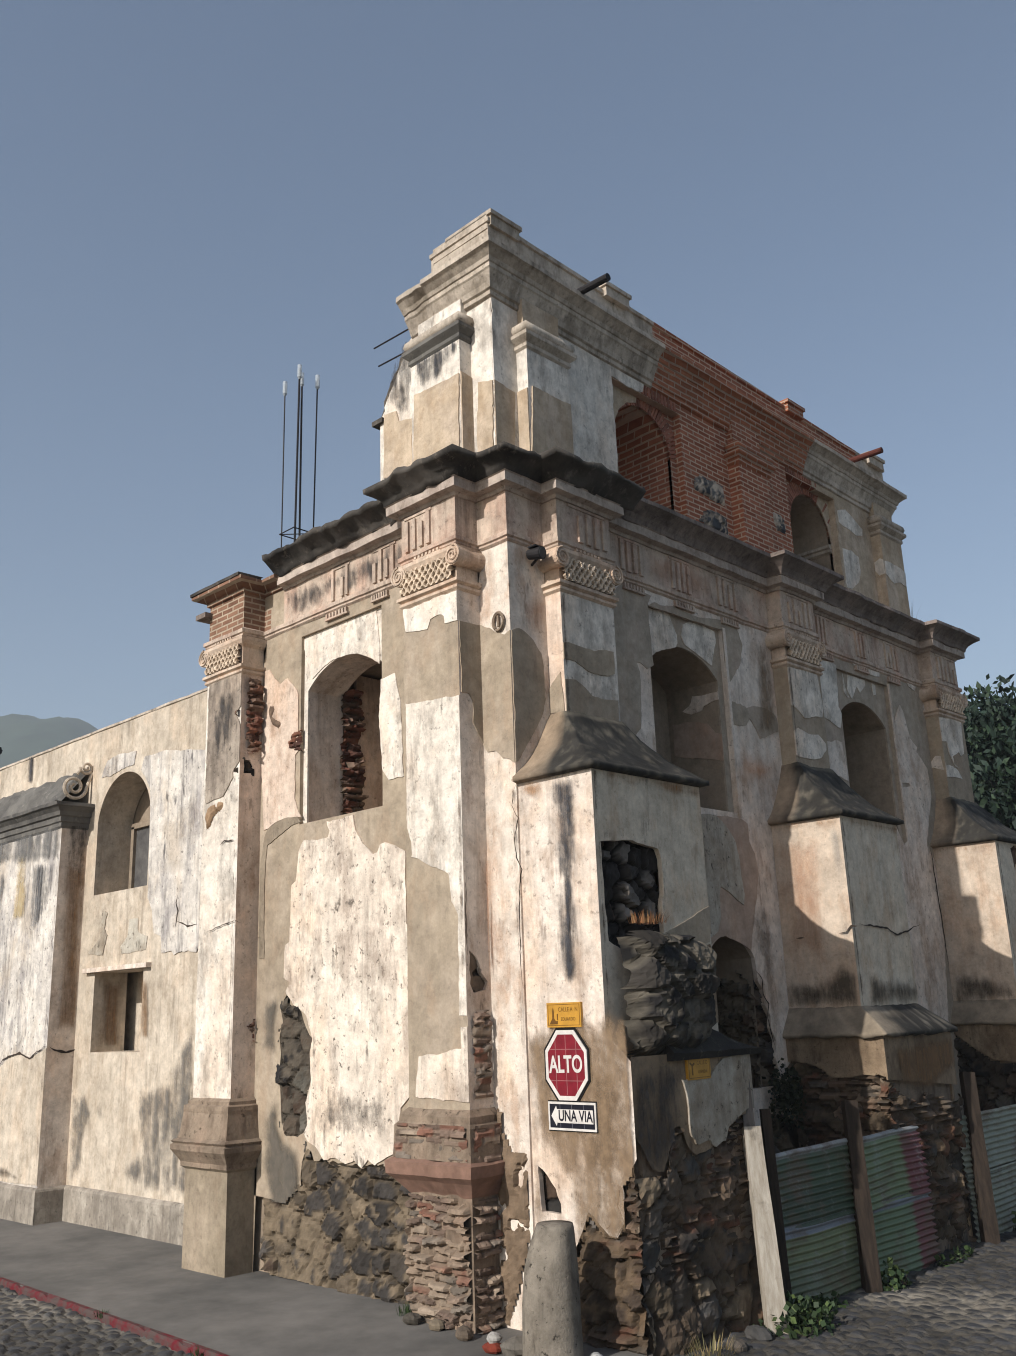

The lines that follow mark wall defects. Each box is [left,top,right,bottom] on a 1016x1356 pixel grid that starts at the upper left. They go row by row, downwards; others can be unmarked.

flaking render [205,673,303,829]
water stain [0,826,87,946]
spalling [462,952,485,992]
water stain [553,782,575,979]
crack [839,848,949,963]
spalling [464,1010,561,1326]